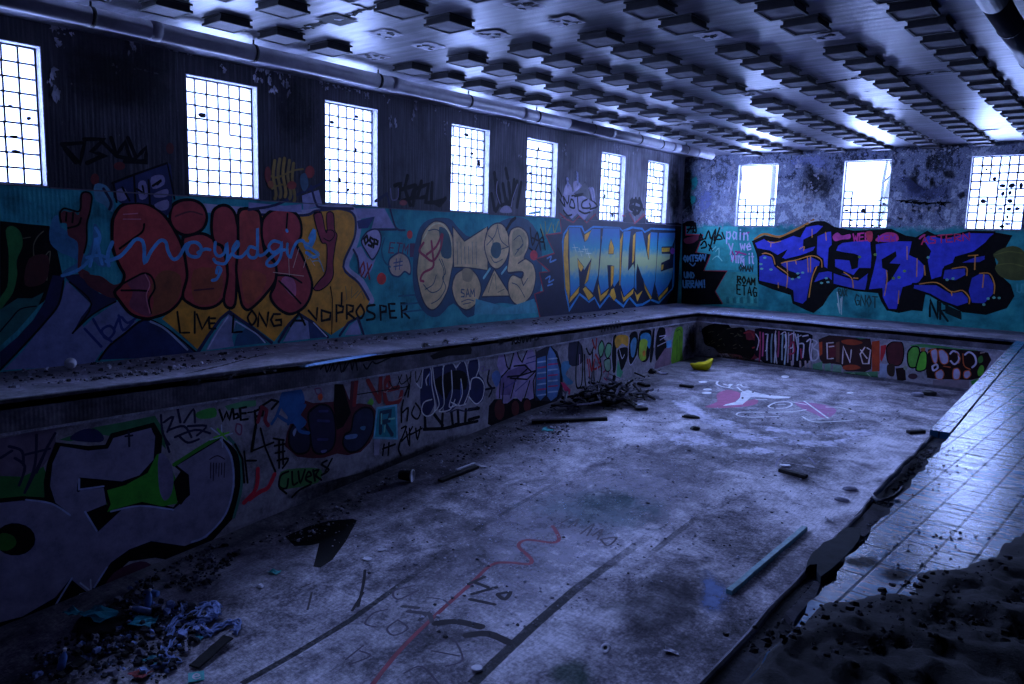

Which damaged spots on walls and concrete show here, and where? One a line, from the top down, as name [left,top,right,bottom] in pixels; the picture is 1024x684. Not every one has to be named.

leakage [670,161,712,218]
leakage [791,155,827,168]
leakage [906,160,965,198]